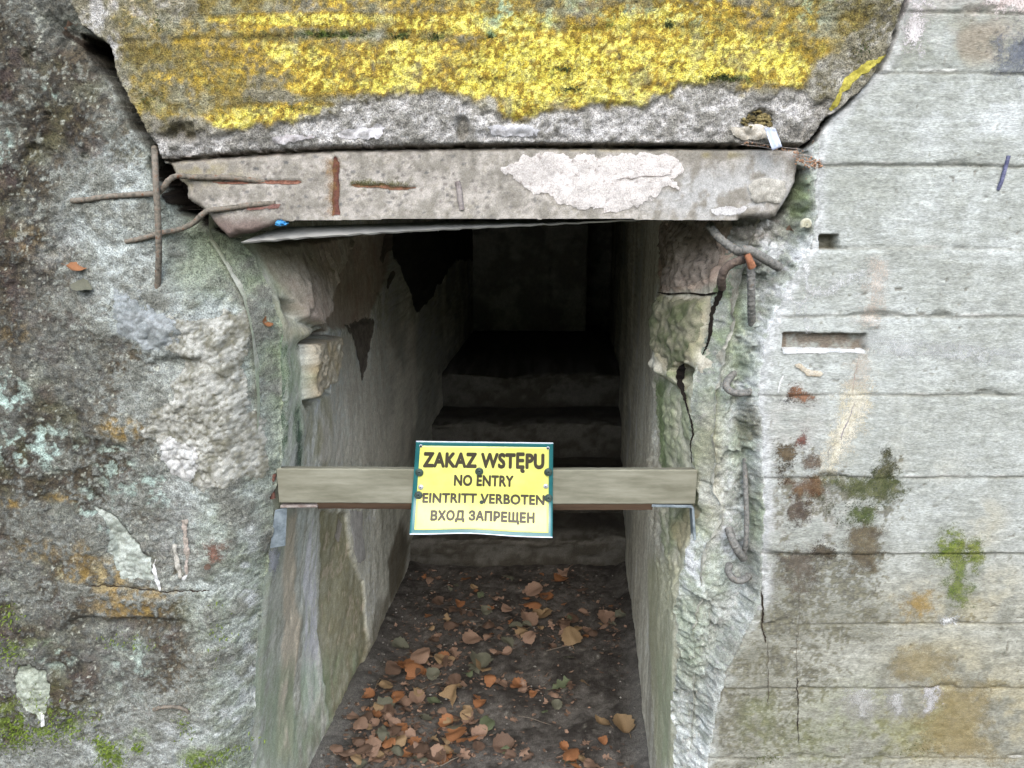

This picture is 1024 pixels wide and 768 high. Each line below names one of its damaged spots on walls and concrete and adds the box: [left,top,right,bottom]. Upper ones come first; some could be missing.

corrosion [332,156,416,215]
peeling [501,144,684,213]
flaking render [345,317,374,380]
crack [657,290,723,463]
spalling [670,54,886,768]
damp [768,377,912,602]
crack [89,584,209,593]
damp [940,537,986,625]
crack [761,589,769,710]
crack [794,566,802,743]
damp [884,694,904,714]
damp [923,686,941,713]